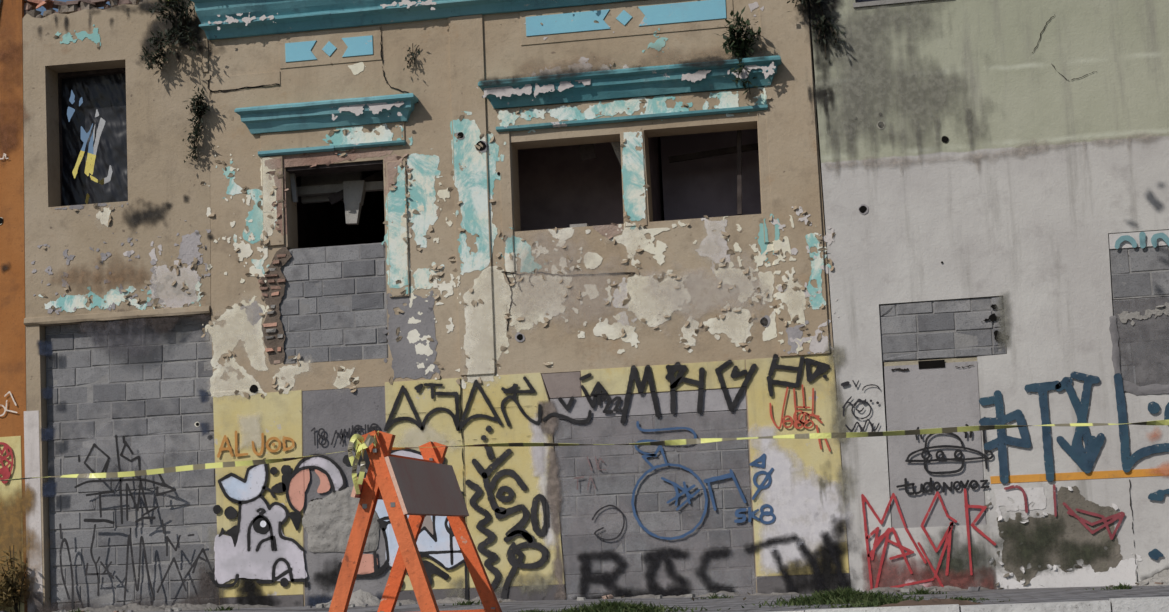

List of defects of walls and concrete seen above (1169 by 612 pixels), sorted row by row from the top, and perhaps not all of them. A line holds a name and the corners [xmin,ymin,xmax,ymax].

peeling [380,0,436,10]
crack [380,28,418,103]
water stain [800,0,966,148]
crack [1032,15,1097,81]
water stain [126,203,171,227]
peeling [31,57,839,399]
spalling [984,483,1142,589]